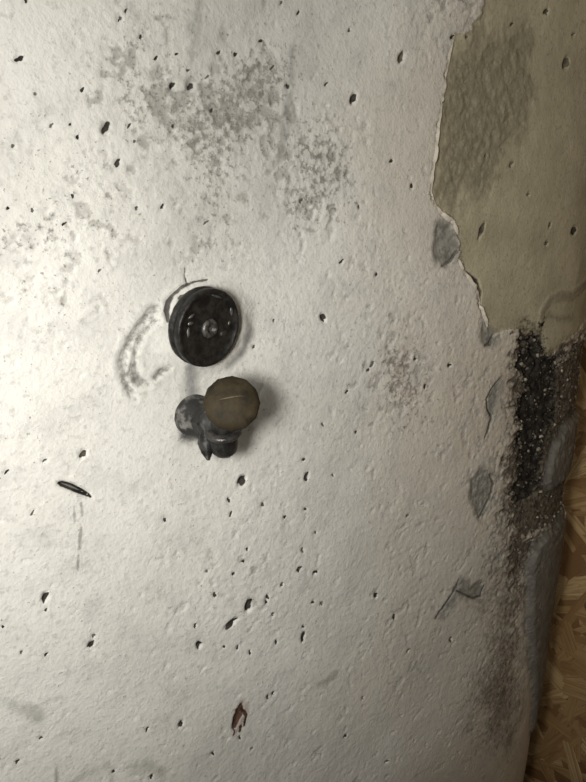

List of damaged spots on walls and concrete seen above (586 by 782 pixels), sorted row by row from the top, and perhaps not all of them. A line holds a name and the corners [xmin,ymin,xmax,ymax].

peeling [430,0,586,588]
corrosion [232,703,247,736]